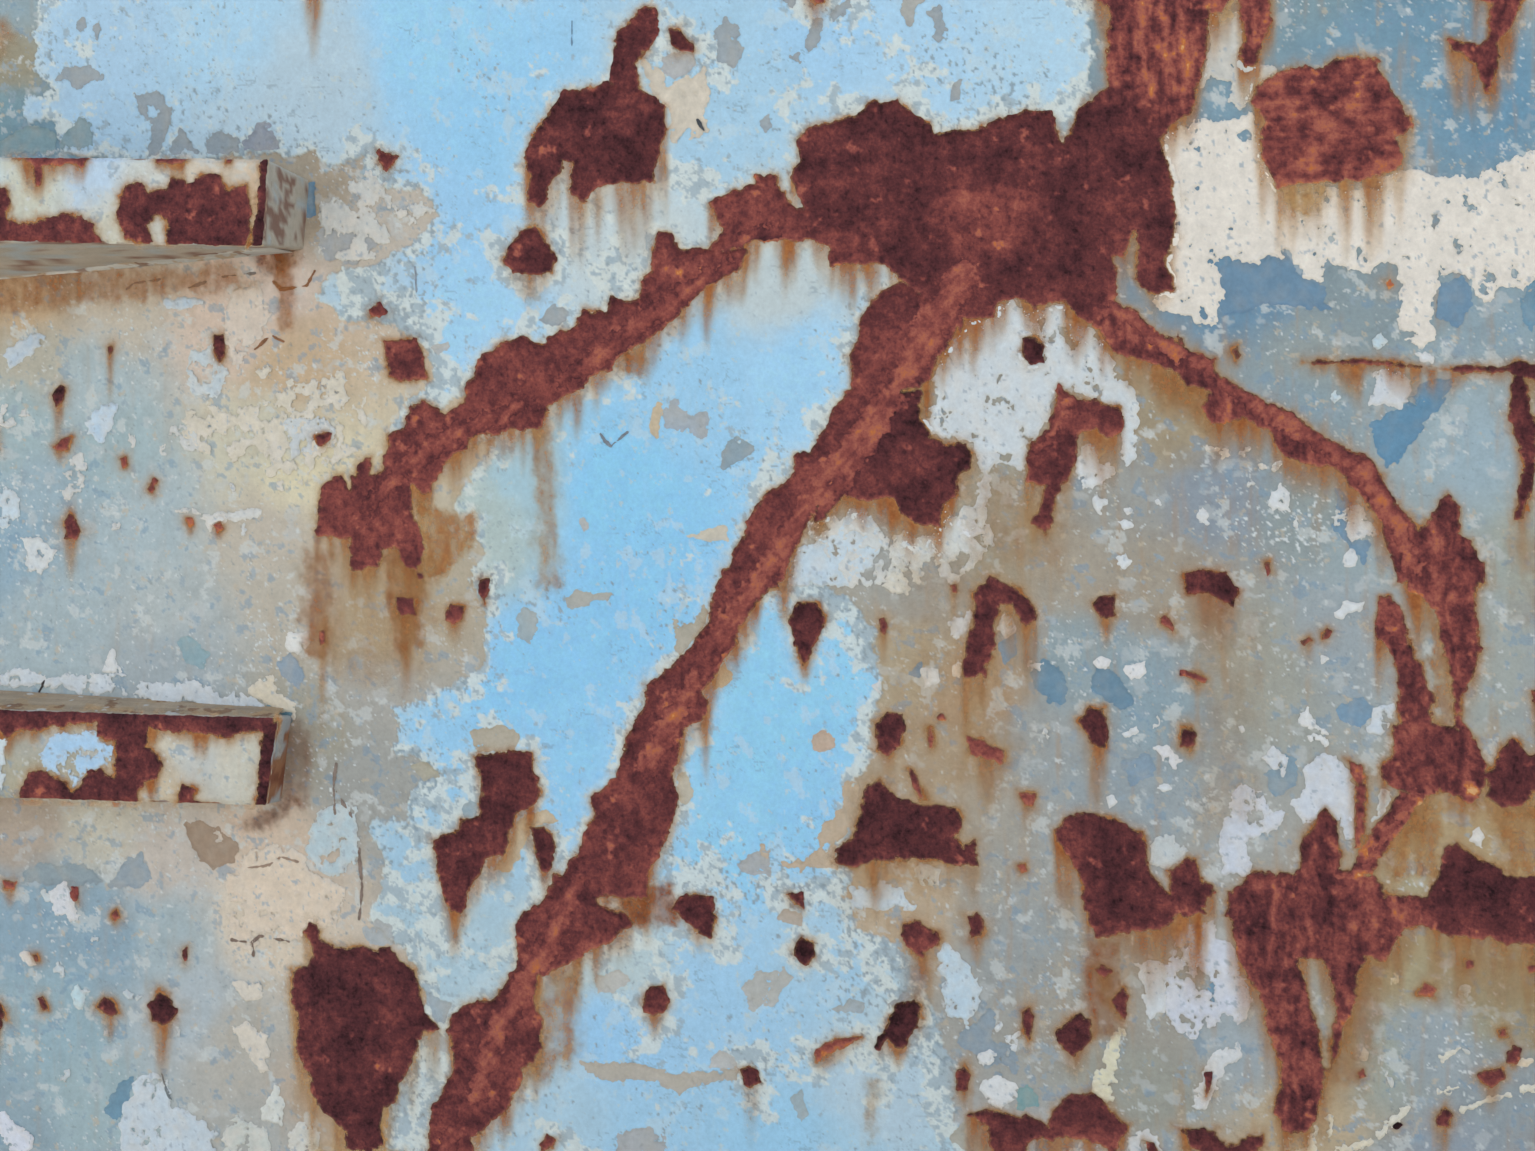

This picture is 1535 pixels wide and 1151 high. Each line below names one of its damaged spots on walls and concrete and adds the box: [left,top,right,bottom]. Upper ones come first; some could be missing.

corrosion [12,158,89,191]
corrosion [0,187,102,243]
corrosion [116,158,292,327]
peeling [1152,11,1535,469]
peeling [159,280,367,492]
peeling [59,452,87,500]
peeling [175,482,262,536]
corrosion [313,0,1535,1151]
corrosion [0,710,280,818]
peeling [183,802,360,956]
peeling [104,1021,321,1151]
corrosion [289,922,440,1151]